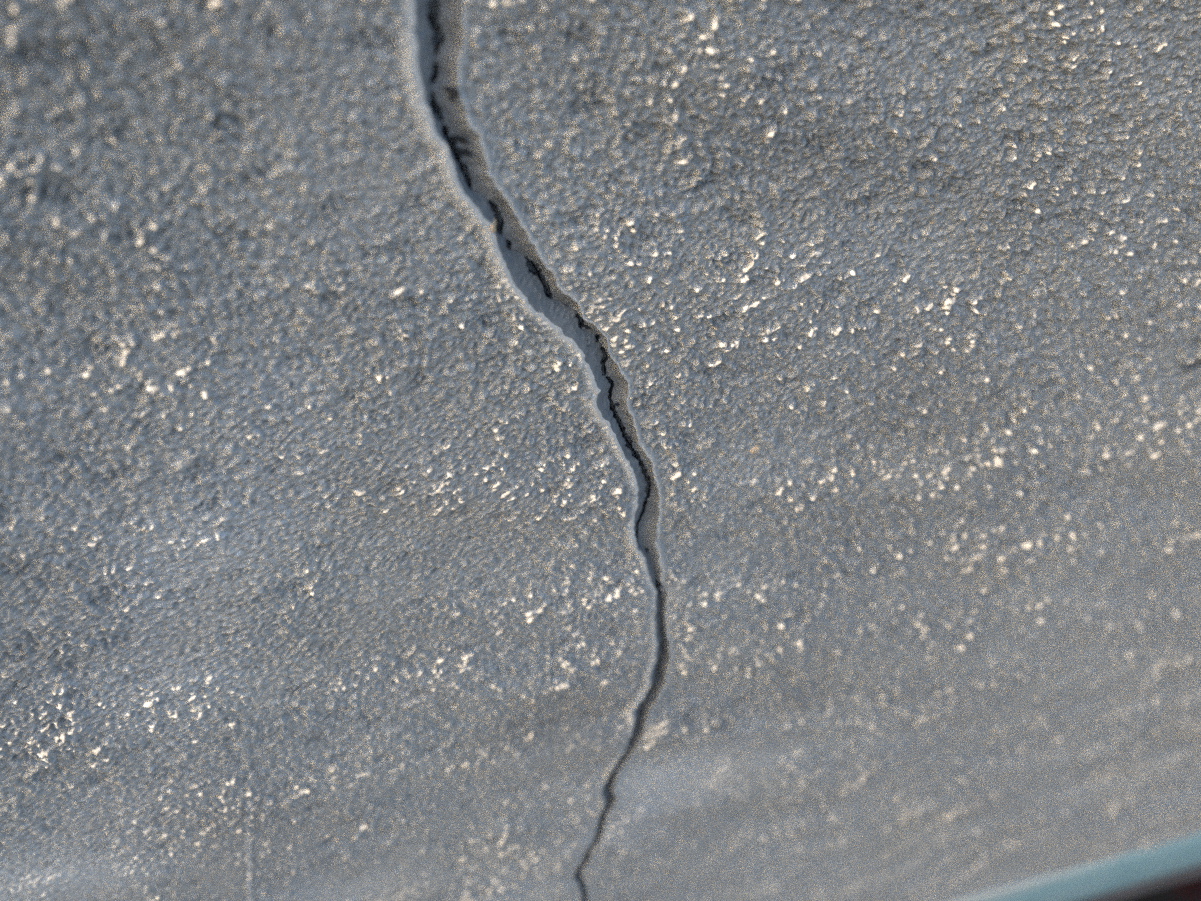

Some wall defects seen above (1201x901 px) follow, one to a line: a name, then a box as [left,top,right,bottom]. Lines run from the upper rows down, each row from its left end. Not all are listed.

crack [391,0,676,901]